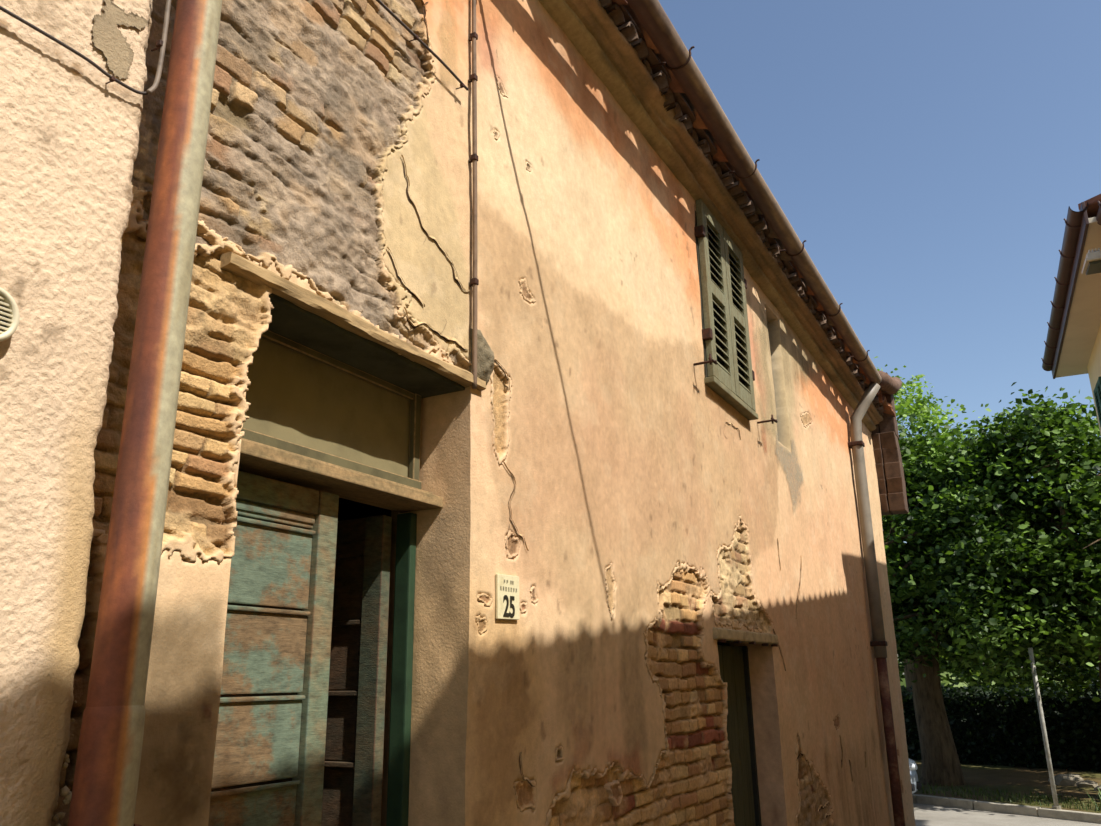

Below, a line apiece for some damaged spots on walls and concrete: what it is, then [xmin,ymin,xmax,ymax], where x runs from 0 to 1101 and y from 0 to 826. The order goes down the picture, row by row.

flaking render [161,0,472,563]
crack [401,155,465,291]
flaking render [51,0,177,826]
spalling [505,530,520,559]
crack [502,461,529,551]
flaking render [513,516,774,826]
flaking render [795,734,835,826]